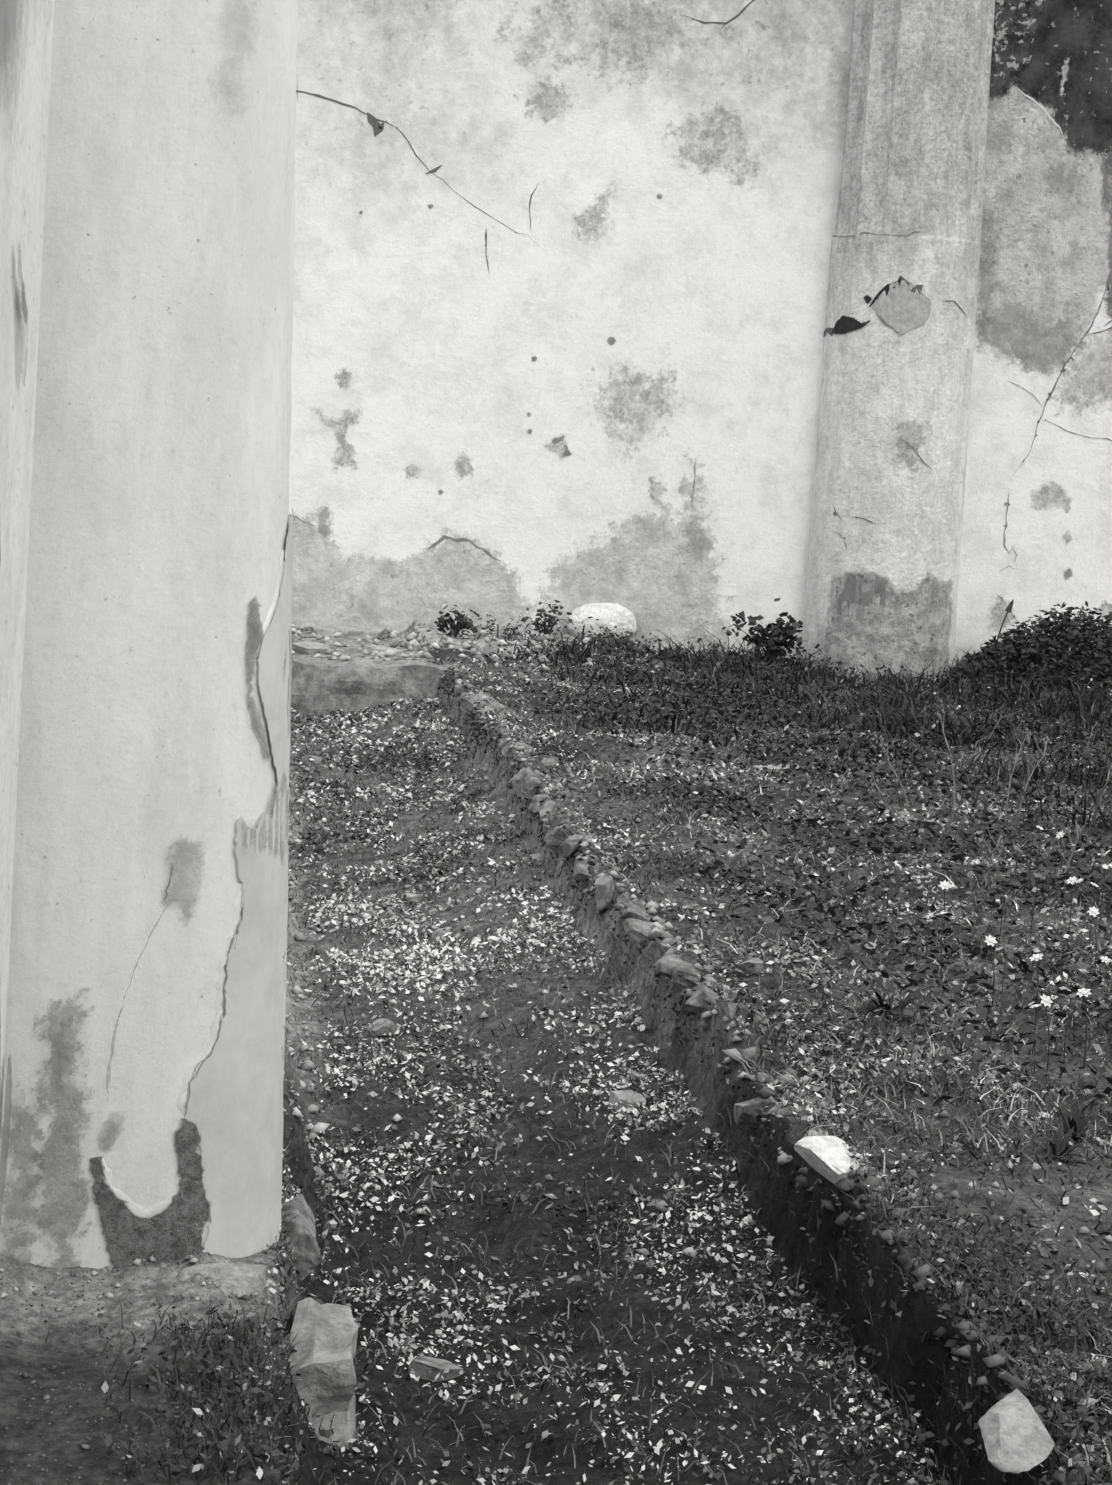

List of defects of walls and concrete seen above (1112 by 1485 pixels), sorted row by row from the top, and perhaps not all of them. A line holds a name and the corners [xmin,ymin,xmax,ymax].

damp [0,0,22,79]
crack [684,0,755,27]
crack [296,90,544,275]
peeling [976,0,1112,375]
spalling [823,276,931,337]
crack [996,284,1112,621]
damp [1051,330,1112,409]
peeling [0,455,732,1270]